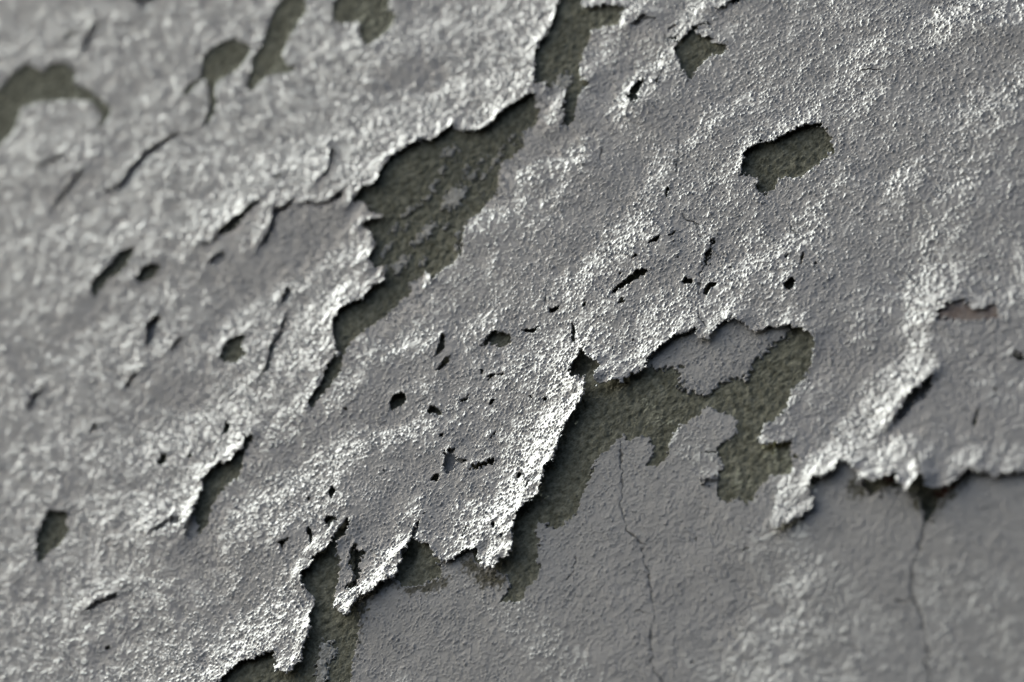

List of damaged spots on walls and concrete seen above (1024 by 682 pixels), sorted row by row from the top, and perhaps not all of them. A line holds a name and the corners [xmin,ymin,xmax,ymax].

peeling [0,14,119,148]
peeling [178,0,407,131]
peeling [290,0,746,371]
peeling [733,115,847,201]
peeling [28,503,74,568]
peeling [201,307,1024,682]
crack [619,438,664,682]
crack [895,523,931,682]